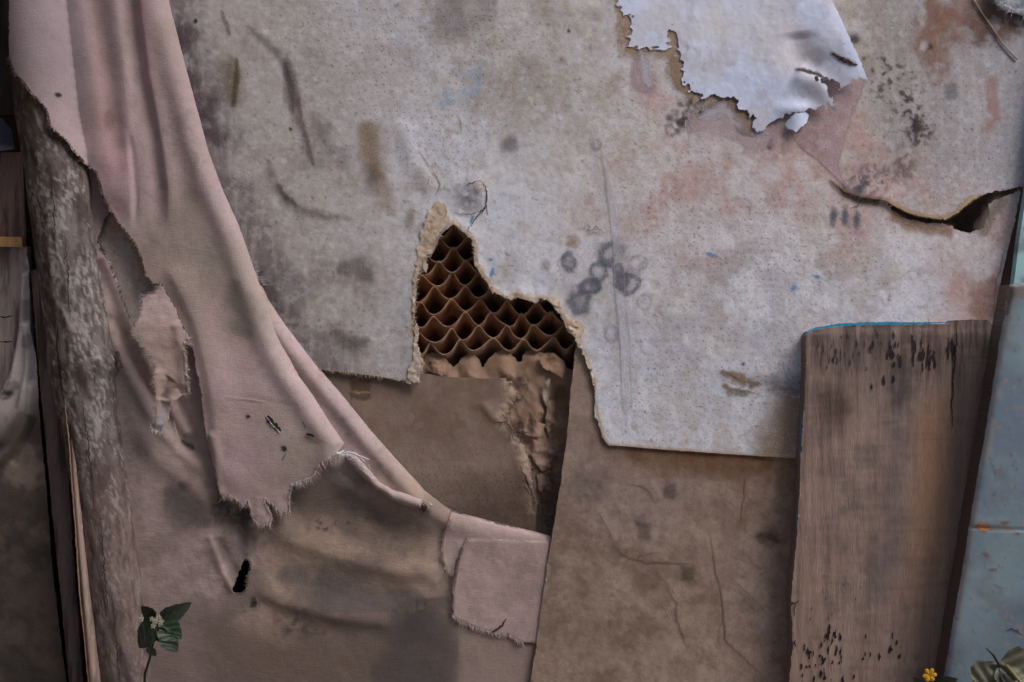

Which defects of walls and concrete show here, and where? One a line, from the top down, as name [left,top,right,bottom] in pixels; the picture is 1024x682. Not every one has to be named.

peeling [615,0,867,197]
peeling [406,201,494,384]
peeling [507,292,595,386]
water stain [561,241,576,271]
water stain [567,242,641,314]
crack [830,181,1006,319]
crack [594,505,799,682]